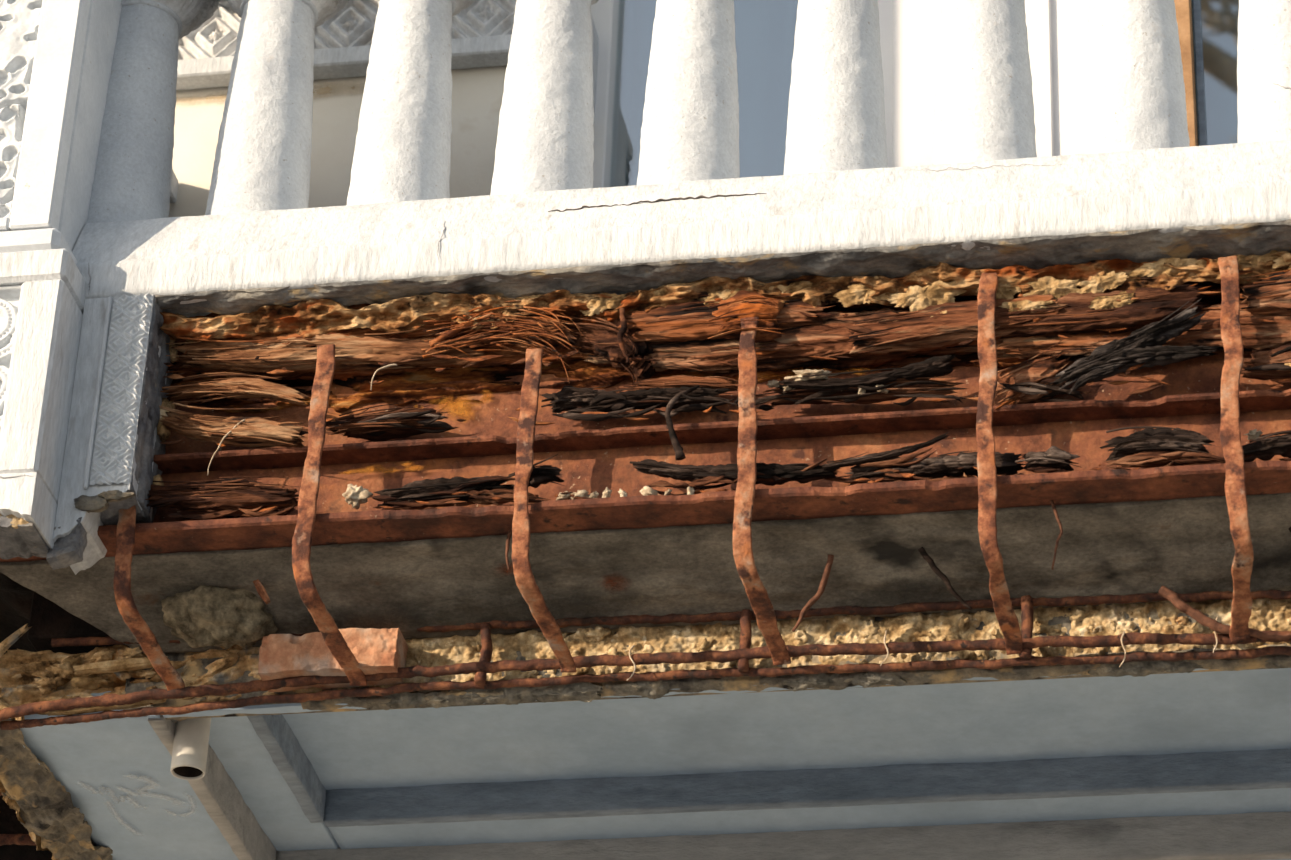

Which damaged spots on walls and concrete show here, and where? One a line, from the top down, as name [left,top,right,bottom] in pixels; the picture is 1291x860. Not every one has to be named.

crack [548,193,766,212]
rust [440,399,473,417]
spalling [0,250,1291,570]
rust [344,462,421,474]
spalling [0,598,1291,860]